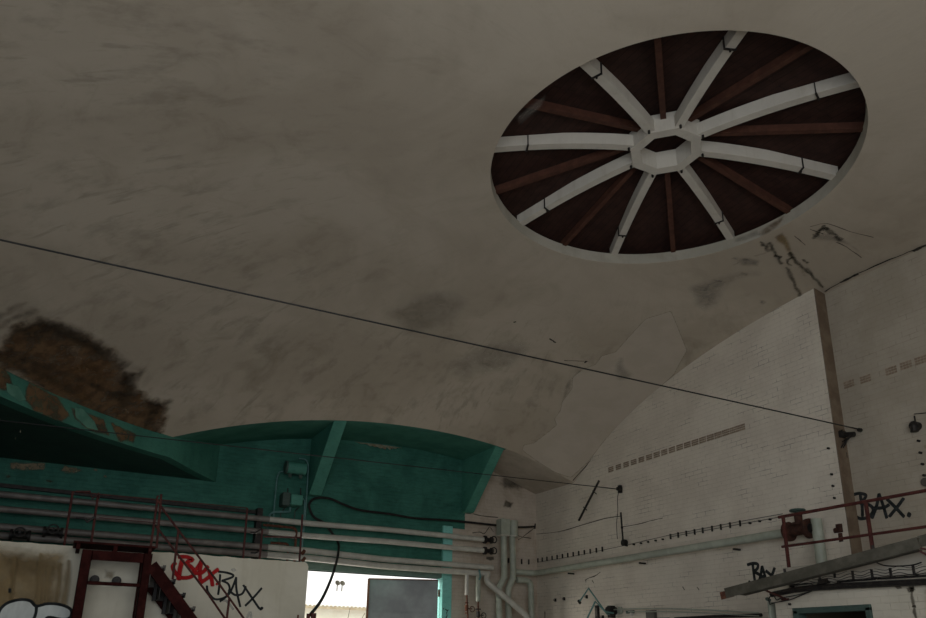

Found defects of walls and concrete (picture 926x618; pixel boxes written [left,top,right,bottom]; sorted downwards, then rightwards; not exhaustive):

peeling [0,368,136,442]
leakage [0,552,70,607]